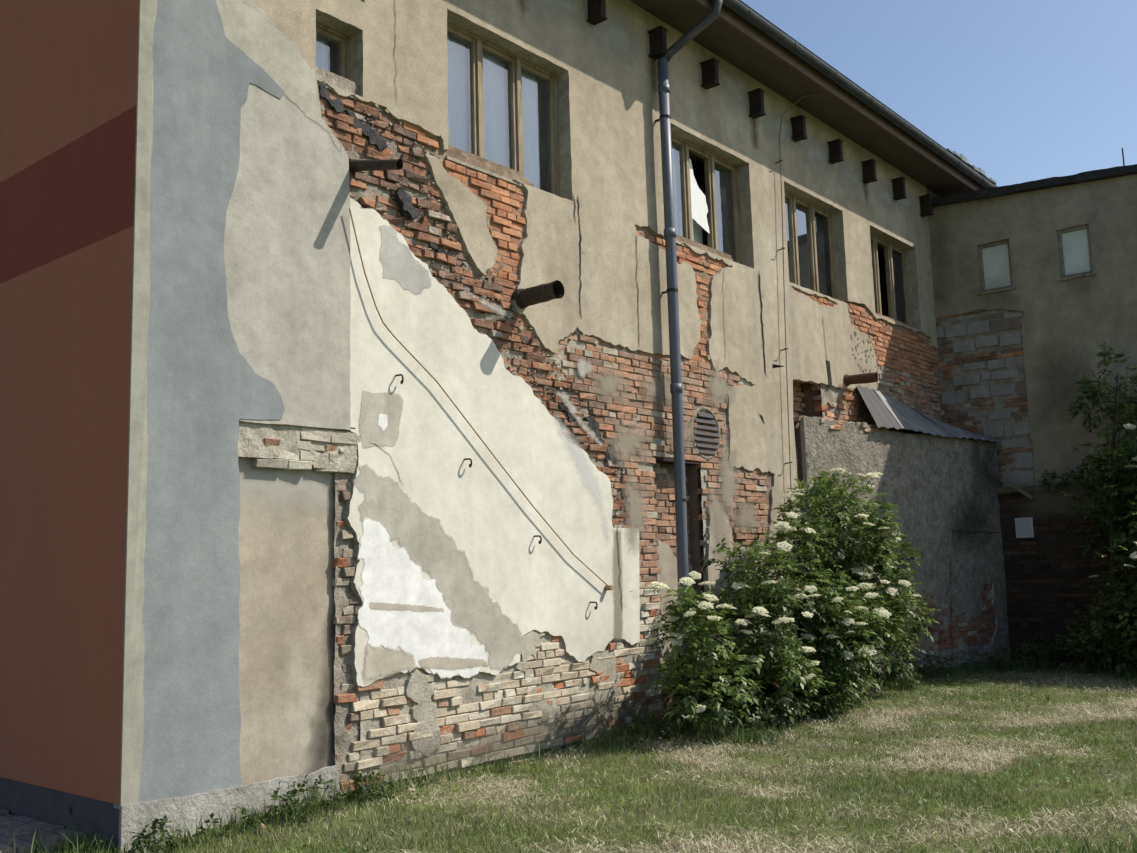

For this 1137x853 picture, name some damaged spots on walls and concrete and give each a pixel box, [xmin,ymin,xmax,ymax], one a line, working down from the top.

flaking render [216,0,772,794]
flaking render [792,287,1037,486]
flaking render [903,583,996,671]